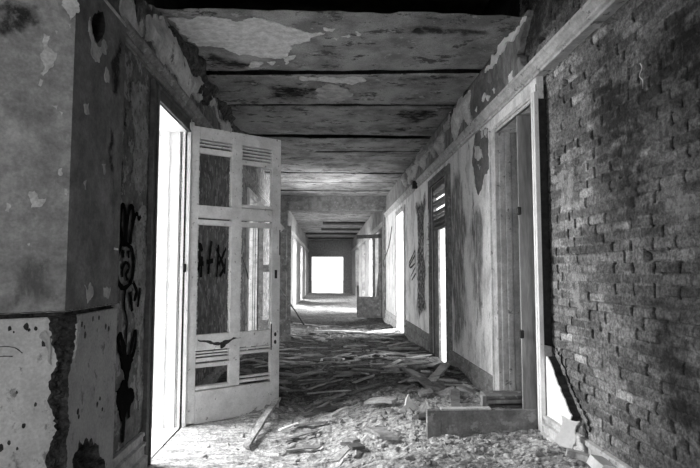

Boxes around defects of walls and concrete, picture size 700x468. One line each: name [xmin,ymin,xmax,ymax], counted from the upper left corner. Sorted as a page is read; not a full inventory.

water stain [0,1,38,34]
peeling [39,31,58,87]
peeling [62,0,80,28]
peeling [88,17,110,83]
peeling [168,16,366,135]
water stain [270,86,316,98]
water stain [397,110,435,122]
peeling [463,16,527,119]
peeling [472,128,489,195]
water stain [416,196,426,315]
water stain [451,176,482,338]
spalling [39,315,105,468]